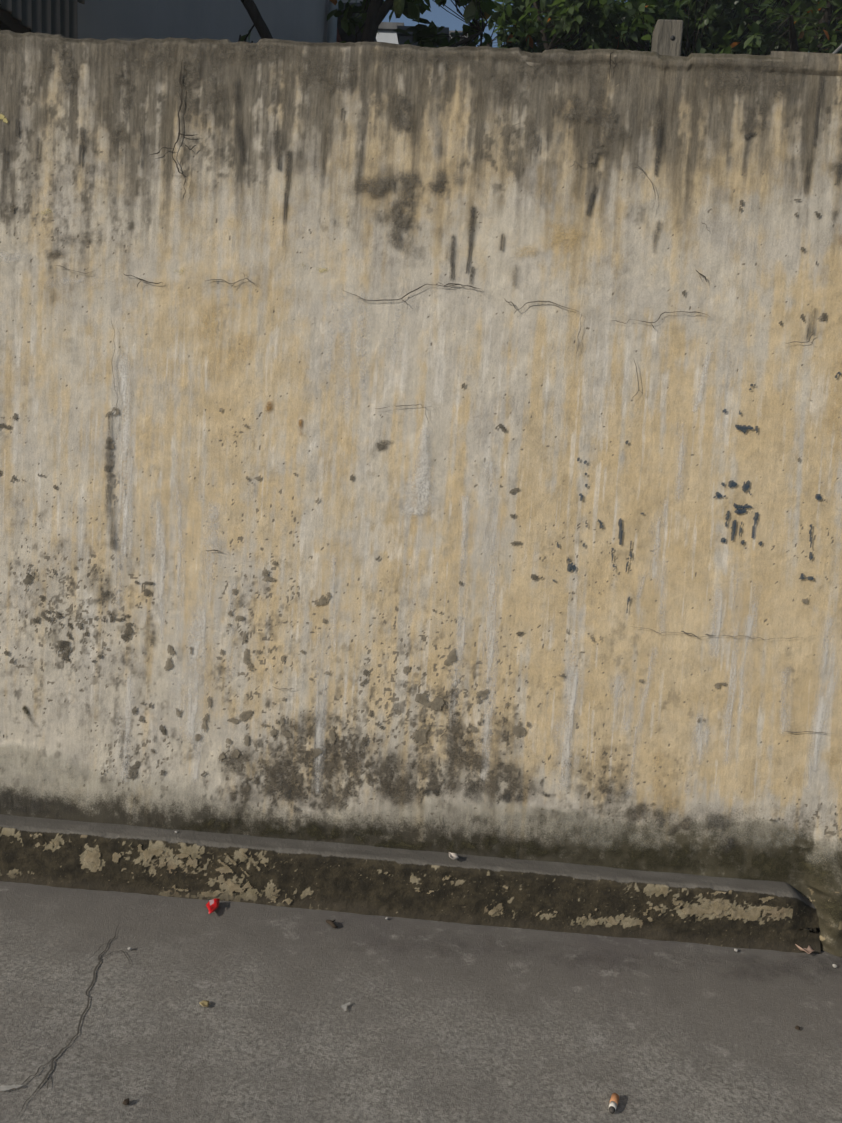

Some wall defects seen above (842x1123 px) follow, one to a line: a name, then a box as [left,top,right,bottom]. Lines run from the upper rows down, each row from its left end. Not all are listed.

water stain [275,131,290,225]
water stain [450,206,475,281]
crack [343,283,480,305]
crack [505,300,582,353]
crack [612,311,704,329]
water stain [105,356,131,554]
water stain [186,624,549,831]
spalling [85,850,121,867]
spalling [137,844,198,872]
spalling [163,852,266,897]
spalling [581,887,780,925]
crack [16,926,132,1118]